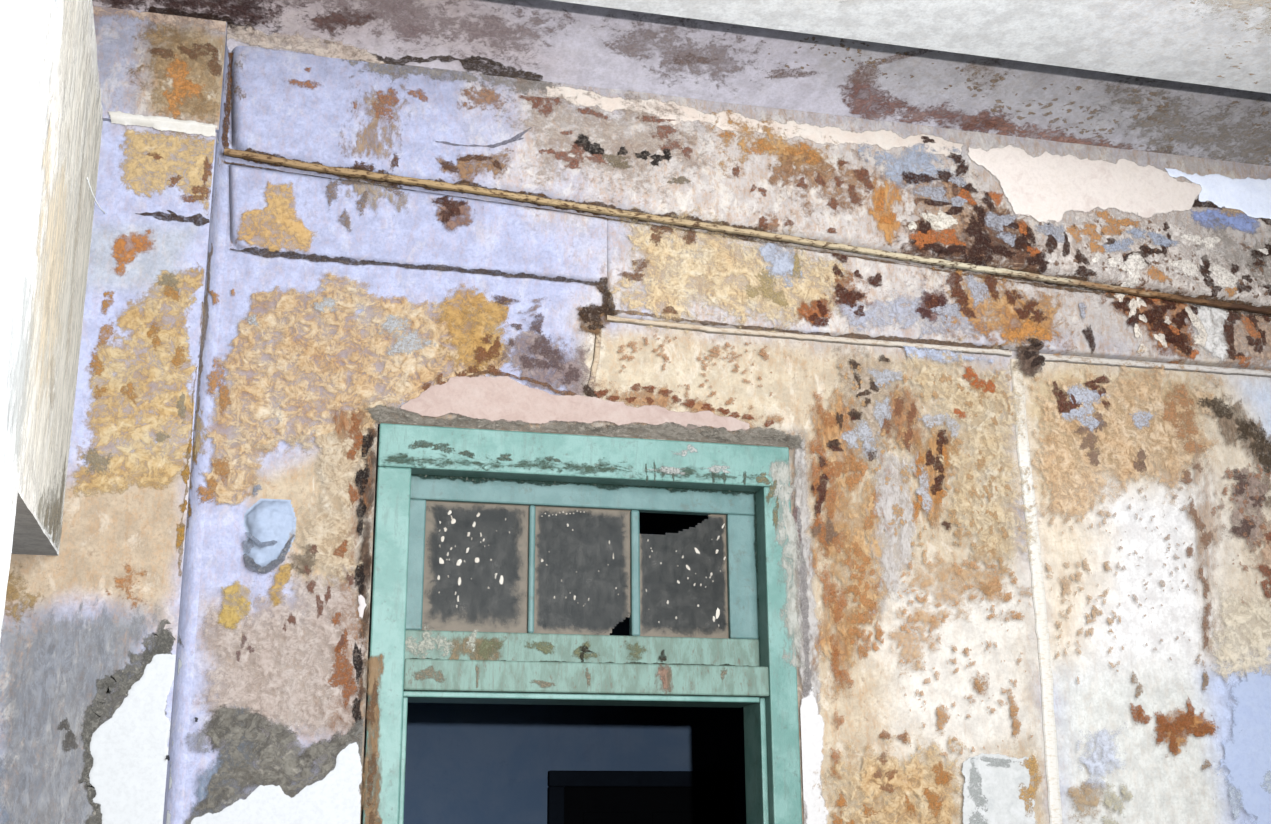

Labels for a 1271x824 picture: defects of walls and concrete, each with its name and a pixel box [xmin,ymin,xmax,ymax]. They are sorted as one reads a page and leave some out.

crack [135,210,210,226]
crack [230,247,1009,350]
crack [148,6,1271,320]
corrosion [796,253,883,327]
damp [603,14,1271,166]
flaking render [895,145,1271,376]
peeling [71,262,750,740]
corrosion [809,384,1033,824]
peeling [827,346,1037,568]
corrosion [916,267,1226,756]